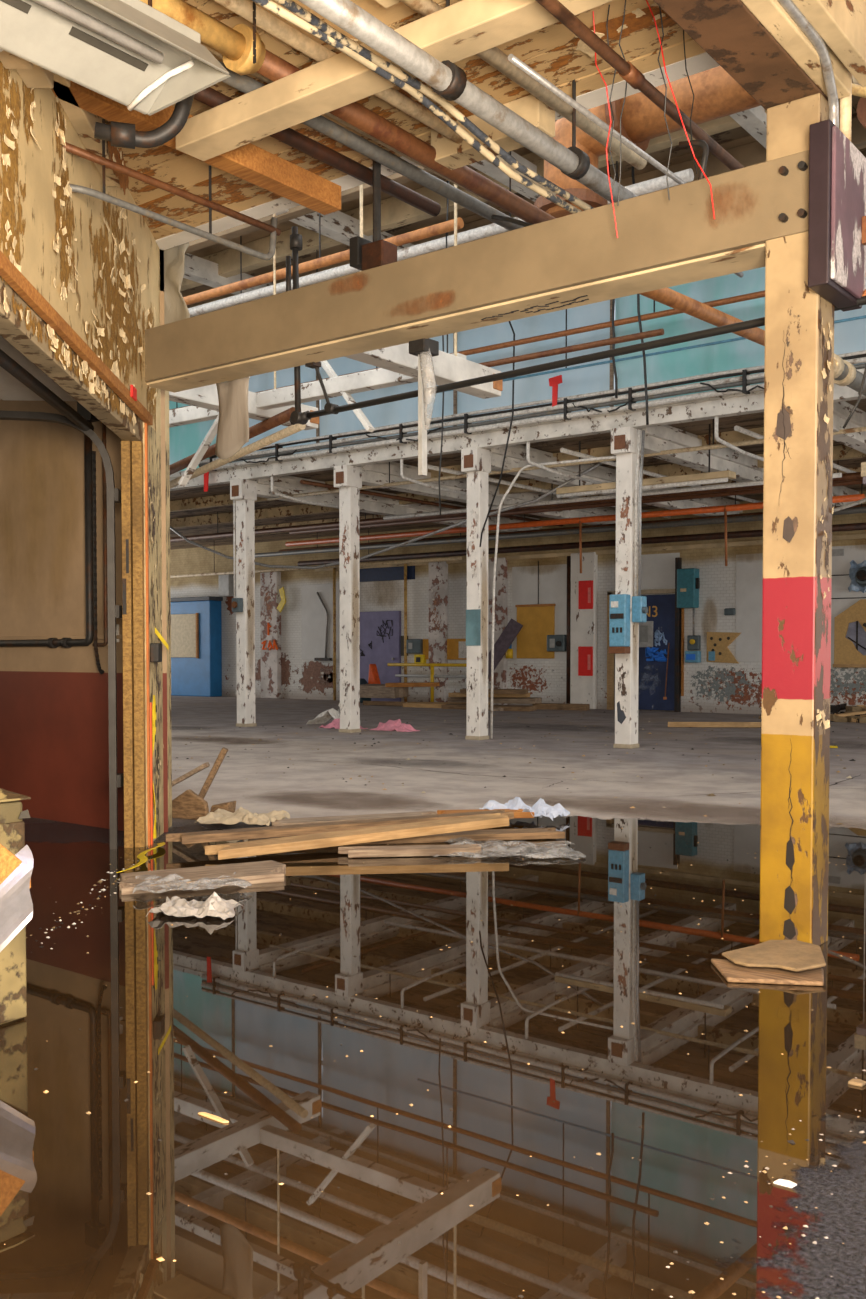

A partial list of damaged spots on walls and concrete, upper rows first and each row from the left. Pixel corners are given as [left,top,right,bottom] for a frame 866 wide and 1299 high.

peeling [0,61,41,272]
peeling [2,97,158,433]
spalling [785,307,807,380]
peeling [821,317,838,424]
peeling [772,402,794,442]
peeling [820,455,834,598]
flaking render [281,652,350,707]
peeling [684,663,762,710]
peeling [816,667,866,729]
crack [786,740,794,918]
spalling [786,836,795,870]
spalling [783,886,798,940]